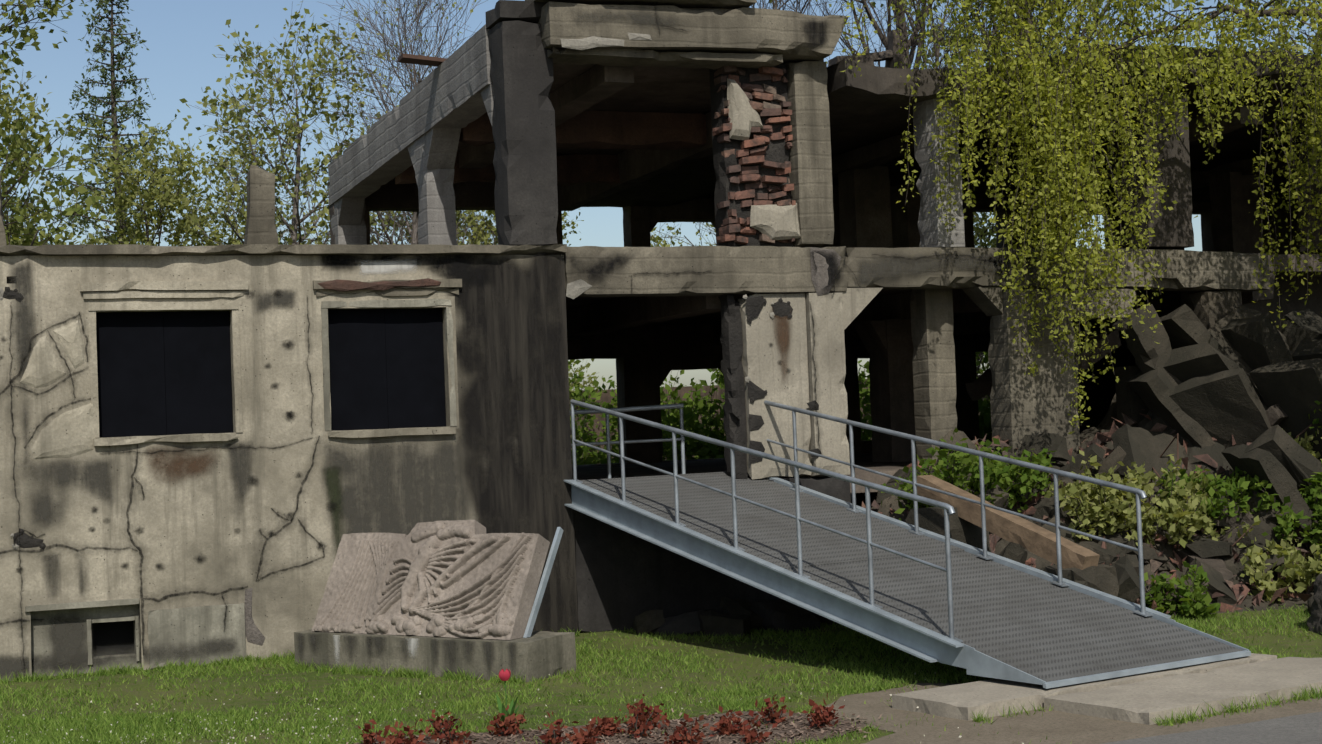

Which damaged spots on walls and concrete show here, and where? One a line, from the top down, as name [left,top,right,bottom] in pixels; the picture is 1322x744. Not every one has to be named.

leakage [361,261,415,273]
spalling [743,294,793,324]
corrosion [775,315,789,371]
spalling [745,376,767,463]
leakage [33,462,110,524]
crack [0,298,325,673]
leakage [228,444,250,498]
leakage [327,442,466,535]